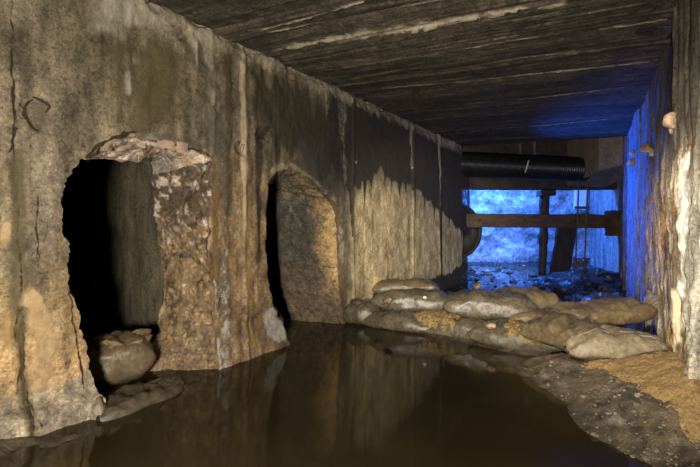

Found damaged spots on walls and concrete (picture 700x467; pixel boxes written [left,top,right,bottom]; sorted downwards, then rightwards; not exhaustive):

leakage [383,68,591,89]
spalling [85,130,137,159]
leakage [225,57,471,297]
crack [9,50,42,436]
crack [68,287,83,384]
efflorescence [213,267,232,370]
efflorescence [265,308,285,342]